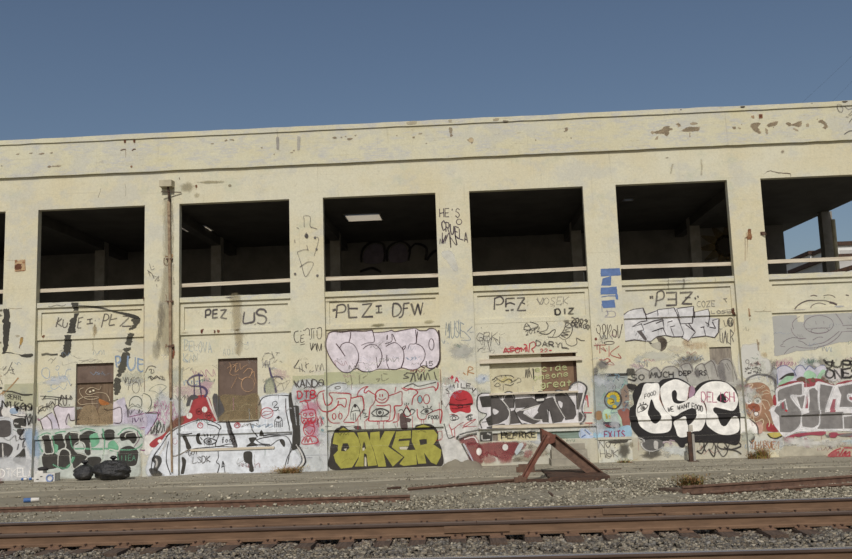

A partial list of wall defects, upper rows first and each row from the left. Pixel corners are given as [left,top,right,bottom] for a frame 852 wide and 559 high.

spalling [651,122,700,140]
spalling [732,119,828,134]